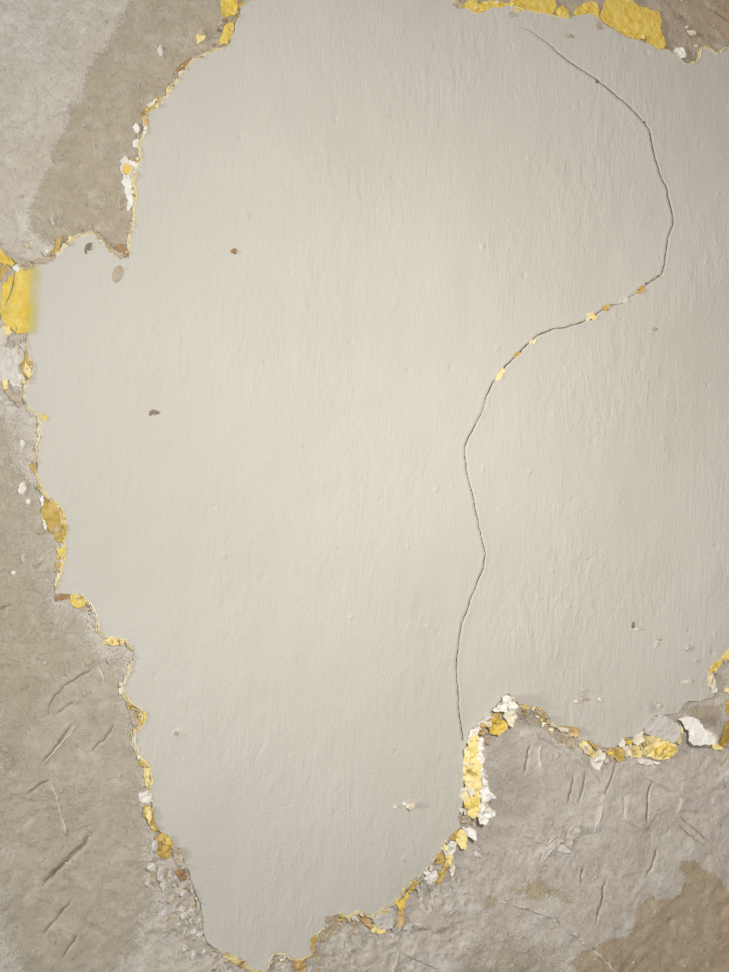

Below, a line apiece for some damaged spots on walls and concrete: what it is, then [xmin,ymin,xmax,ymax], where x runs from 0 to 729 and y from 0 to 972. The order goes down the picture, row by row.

peeling [0,0,254,590]
crack [456,28,673,739]
peeling [453,0,729,64]
peeling [40,593,729,972]